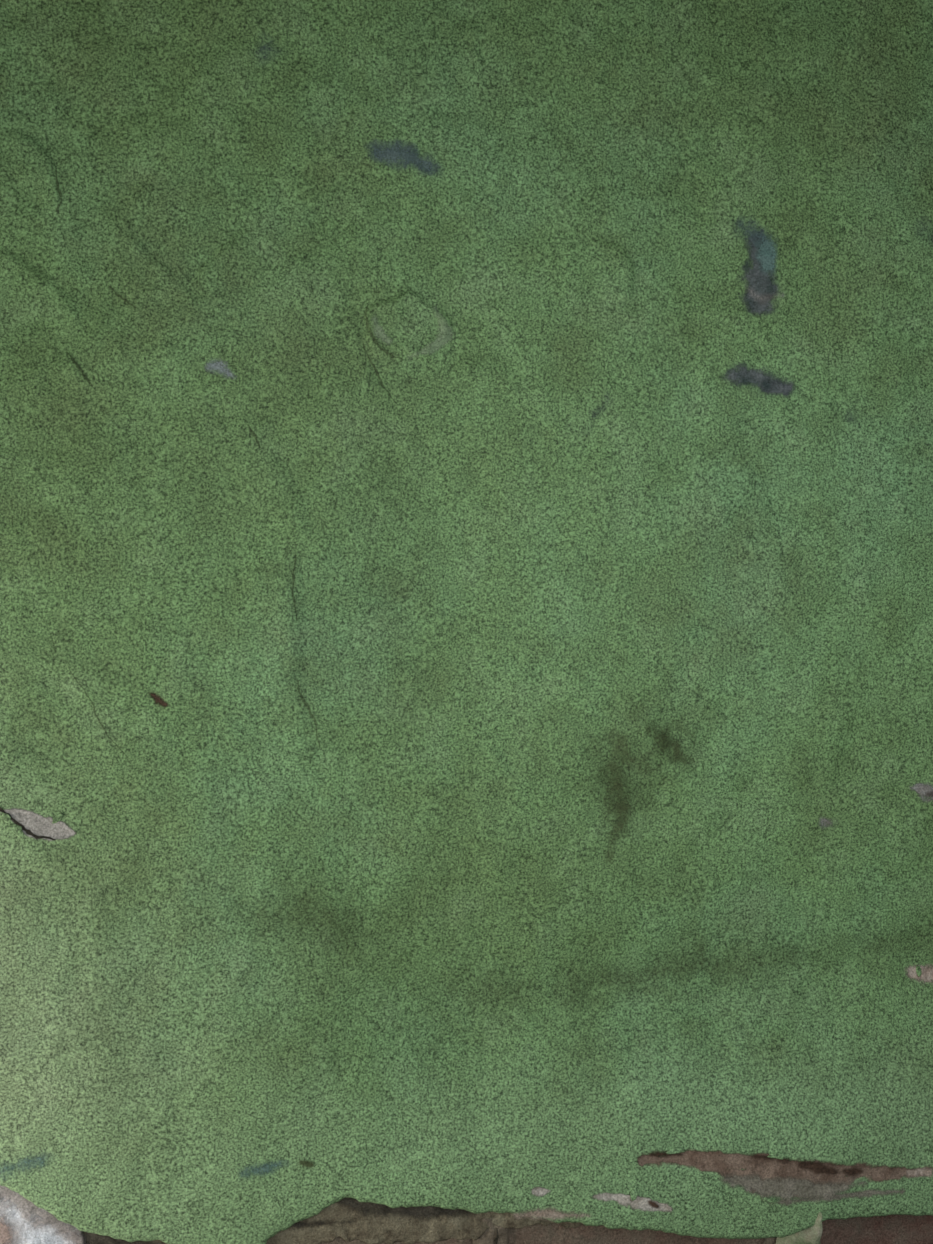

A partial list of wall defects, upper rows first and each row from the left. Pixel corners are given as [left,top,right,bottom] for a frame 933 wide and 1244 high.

damp [739,224,778,314]
damp [723,365,792,396]
peeling [0,808,75,841]
peeling [908,965,933,982]
spalling [638,1147,932,1203]
peeling [0,1189,166,1244]
spalling [266,1186,777,1244]
spalling [820,1215,933,1244]